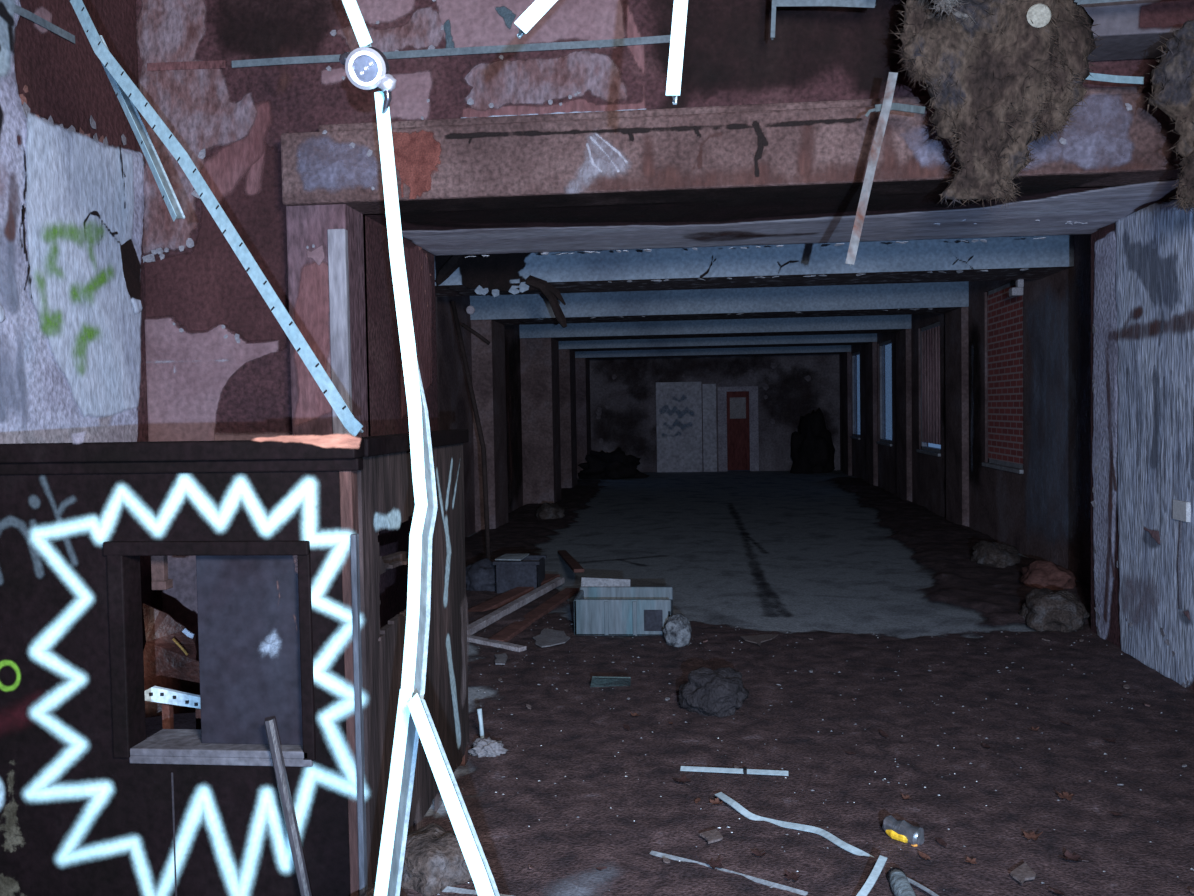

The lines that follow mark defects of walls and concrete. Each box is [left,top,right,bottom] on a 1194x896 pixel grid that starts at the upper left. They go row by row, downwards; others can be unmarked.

flaking render [330,0,645,120]
flaking render [298,130,379,190]
flaking render [0,0,361,449]
peeling [402,180,1194,688]
peeling [461,598,469,706]